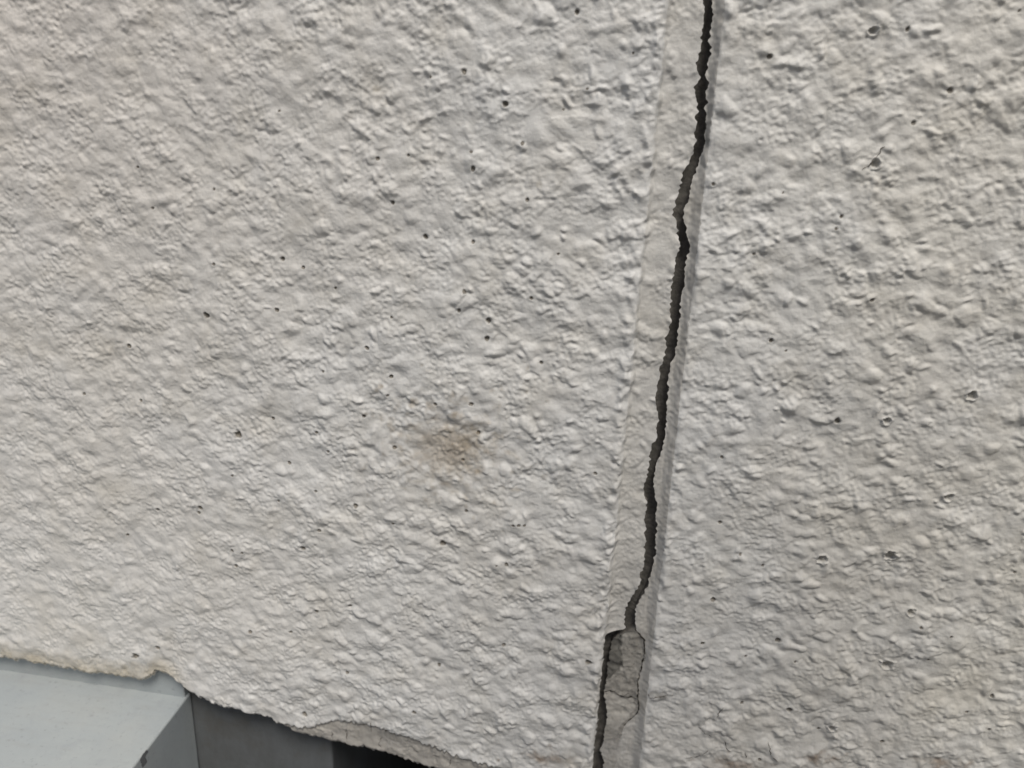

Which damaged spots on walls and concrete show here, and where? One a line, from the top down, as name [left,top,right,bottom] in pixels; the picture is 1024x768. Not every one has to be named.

spalling [604,630,645,735]
crack [592,0,714,768]